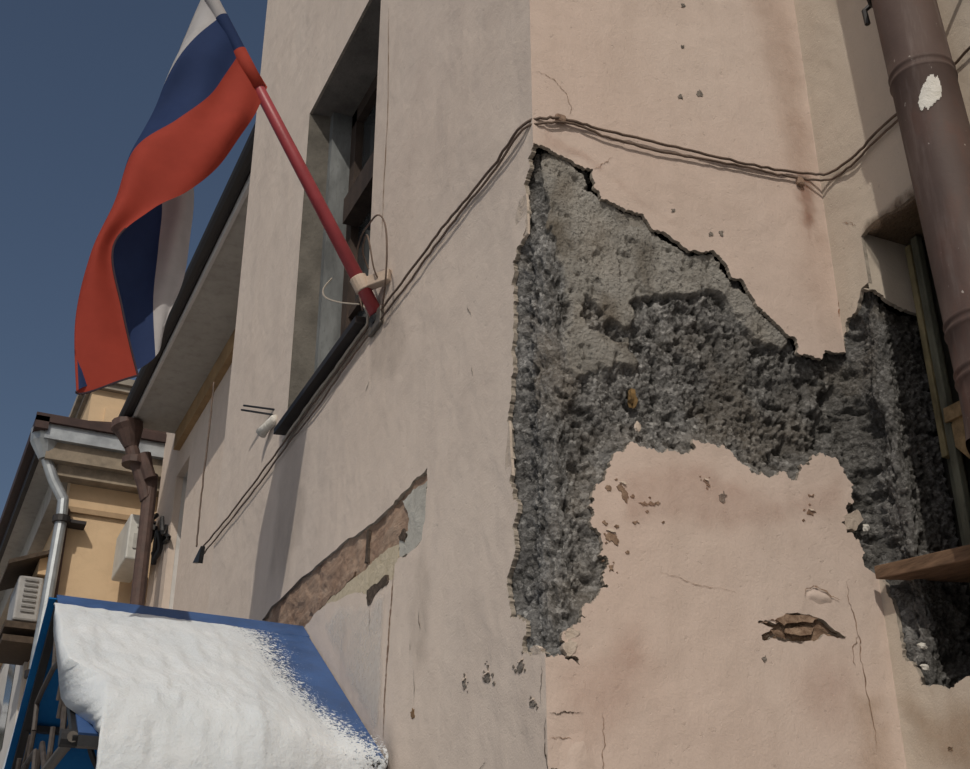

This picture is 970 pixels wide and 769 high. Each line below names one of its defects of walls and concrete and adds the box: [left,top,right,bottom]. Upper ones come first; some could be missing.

flaking render [505,151,958,674]
flaking render [265,475,427,627]
flaking render [482,661,496,686]
crack [540,668,580,769]
crack [847,586,877,743]
flaking render [886,579,970,689]